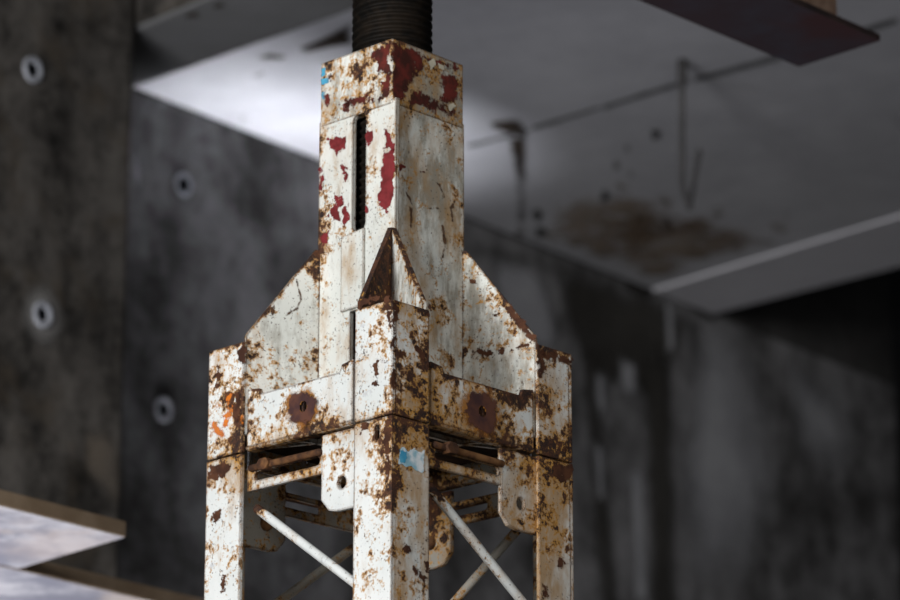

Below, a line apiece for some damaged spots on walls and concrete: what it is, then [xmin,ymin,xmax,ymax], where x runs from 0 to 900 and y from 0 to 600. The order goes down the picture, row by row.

peeling [323,40,459,117]
peeling [327,136,348,183]
peeling [377,129,406,213]
peeling [327,194,350,227]
rust [237,342,247,364]
rust [356,292,429,368]
rust [472,304,574,378]
rust [210,392,243,437]
rust [286,389,318,430]
rust [461,388,500,437]
rust [207,462,231,481]
rust [412,561,430,583]